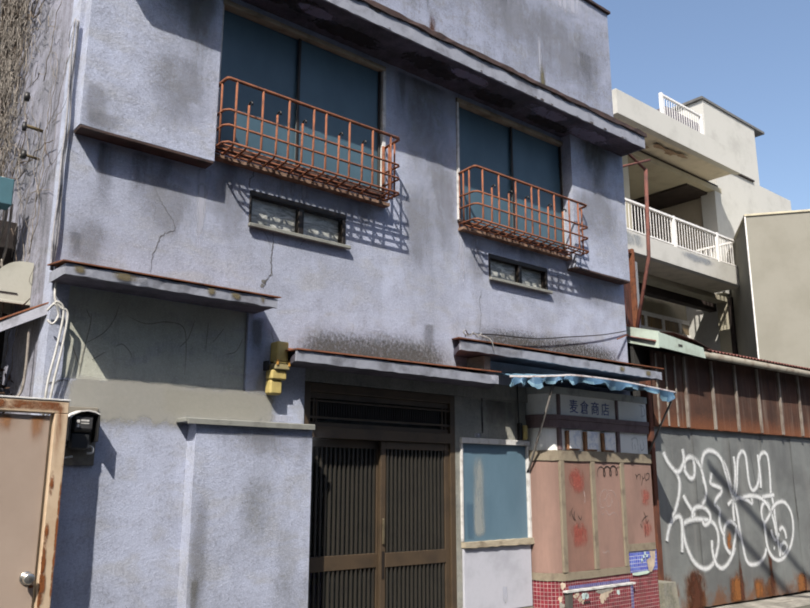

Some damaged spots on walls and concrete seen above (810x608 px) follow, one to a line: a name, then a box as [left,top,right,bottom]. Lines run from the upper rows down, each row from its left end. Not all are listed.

crack [150,185,176,274]
crack [260,232,274,289]
leakage [308,336,441,364]
rust [0,399,62,432]
rust [28,478,61,608]
spalling [558,582,620,608]
rust [687,572,706,608]
rust [731,565,745,601]
rust [754,556,776,598]